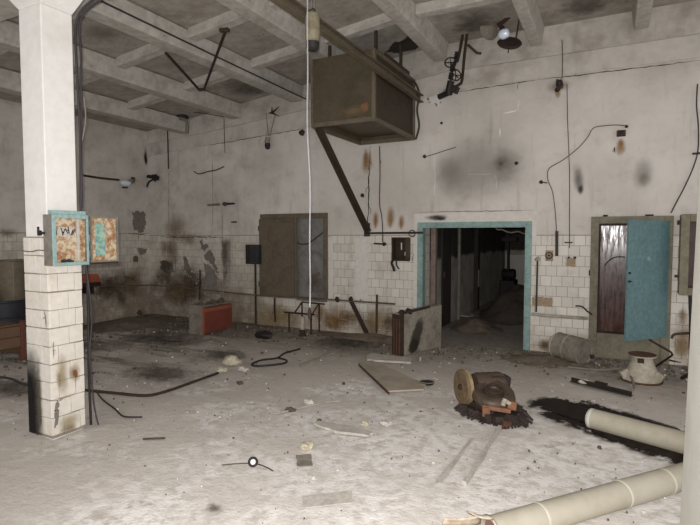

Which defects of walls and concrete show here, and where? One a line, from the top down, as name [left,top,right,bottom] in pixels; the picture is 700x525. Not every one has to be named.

peeling [132,211,147,233]
flaking render [183,239,219,296]
damp [409,321,423,353]
damp [0,377,41,433]